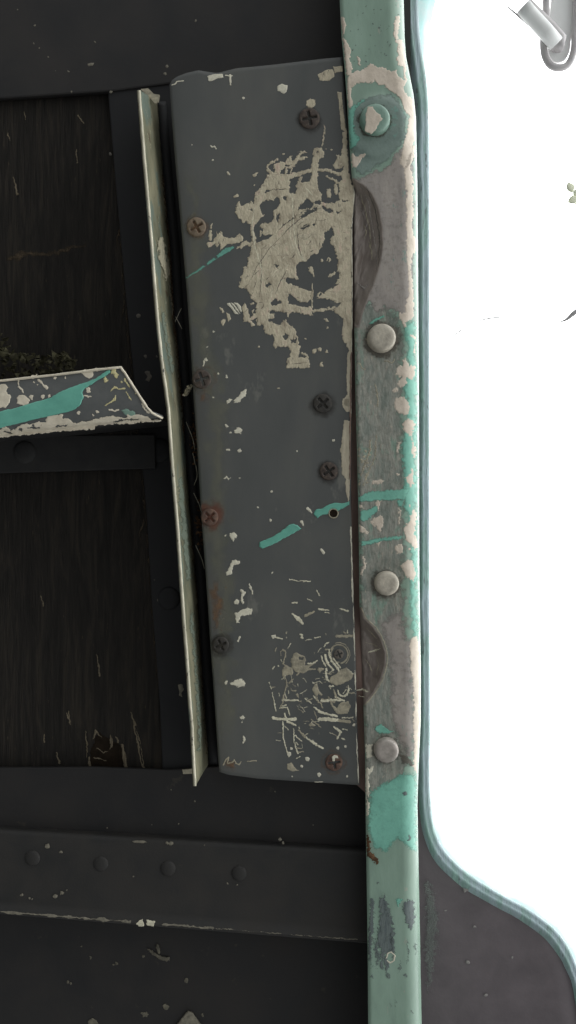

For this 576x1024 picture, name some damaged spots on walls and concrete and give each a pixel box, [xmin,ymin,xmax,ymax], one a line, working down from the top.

peeling [0,369,161,438]
peeling [207,16,420,816]